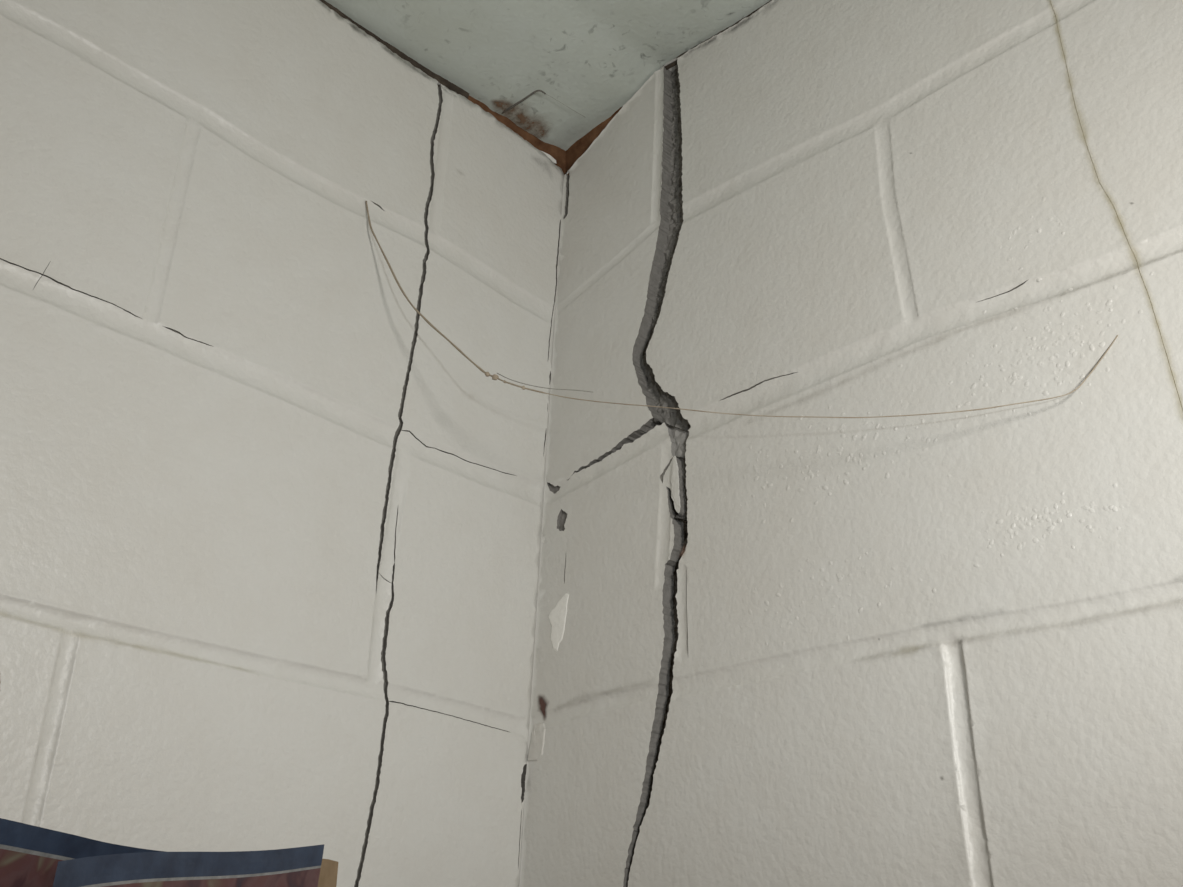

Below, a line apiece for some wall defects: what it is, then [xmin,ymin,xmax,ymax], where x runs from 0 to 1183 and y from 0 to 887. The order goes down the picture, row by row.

crack [354,84,516,887]
crack [543,173,570,456]
peeling [548,593,569,651]
crack [568,66,691,887]